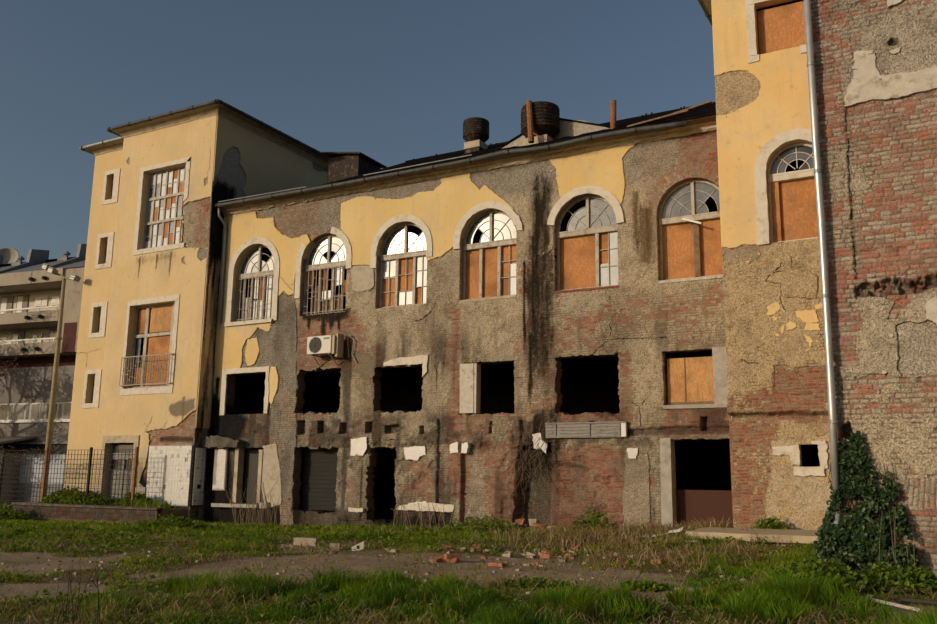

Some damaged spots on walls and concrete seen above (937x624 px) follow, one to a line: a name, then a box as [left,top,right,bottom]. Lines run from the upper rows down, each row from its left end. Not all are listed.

flaking render [715,70,761,117]
flaking render [839,0,937,103]
flaking render [181,147,246,264]
flaking render [256,179,441,238]
flaking render [468,160,560,262]
flaking render [619,130,719,283]
leakage [523,175,554,397]
peeling [767,302,823,347]
flaking render [839,271,937,380]
flaking render [140,411,198,487]
flaking render [250,292,304,526]
flaking render [770,364,827,393]